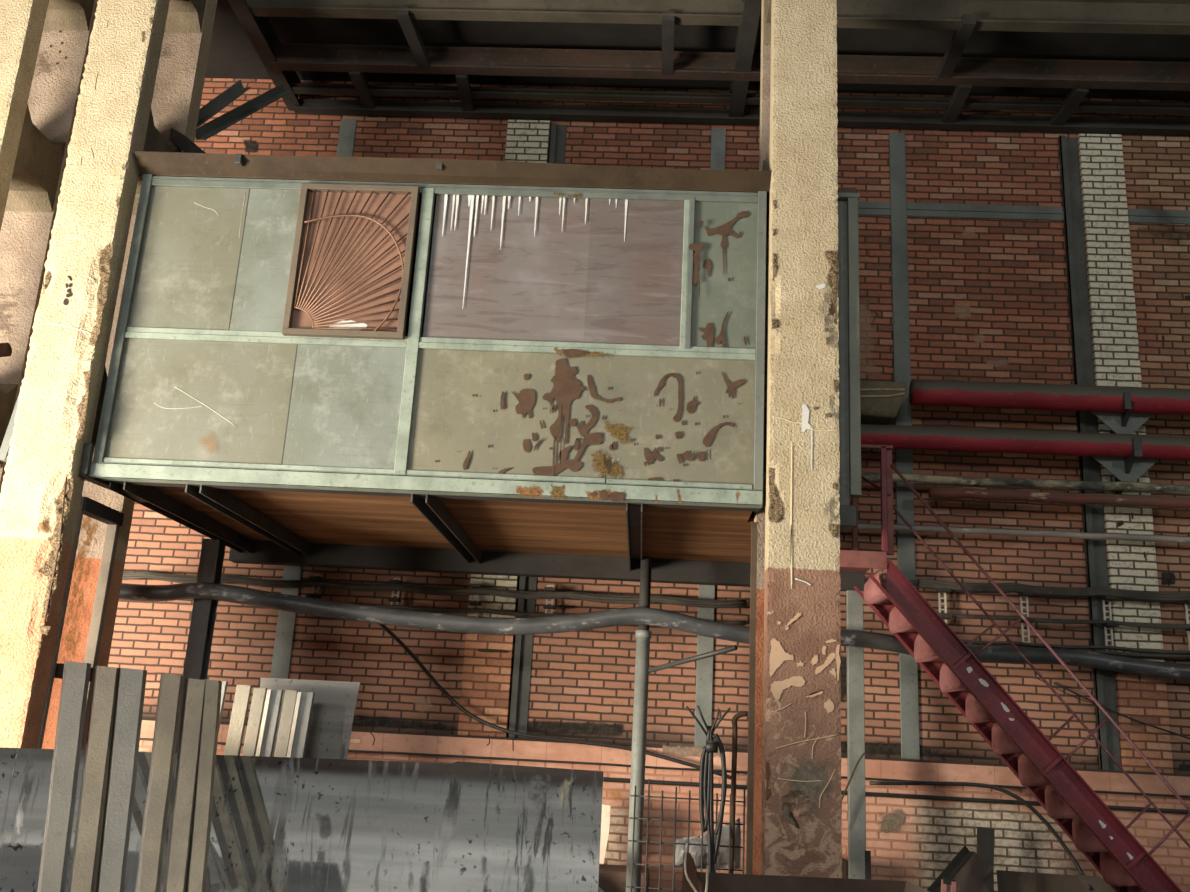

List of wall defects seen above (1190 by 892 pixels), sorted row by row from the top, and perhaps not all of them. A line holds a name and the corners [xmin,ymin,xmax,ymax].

damp [559,198,588,228]
damp [451,195,538,309]
spalling [89,244,113,346]
spalling [825,251,839,345]
spalling [71,370,91,454]
corrosion [604,421,633,444]
corrosion [516,485,566,499]
corrosion [586,449,626,502]
spalling [769,468,783,523]
spalling [829,524,839,538]
peeling [769,612,841,713]
spalling [783,803,799,829]